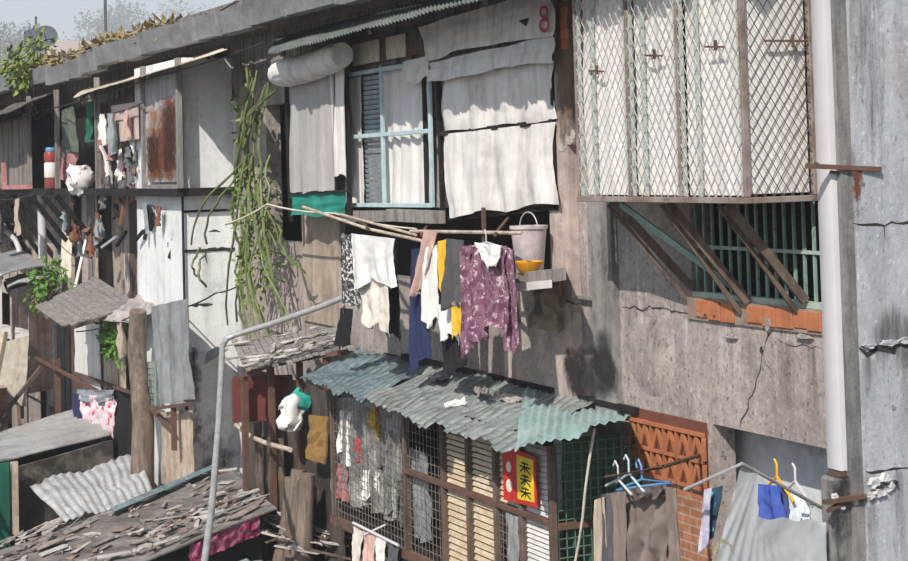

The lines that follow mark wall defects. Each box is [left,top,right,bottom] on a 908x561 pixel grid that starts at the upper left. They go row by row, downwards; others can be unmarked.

corrosion [145,73,177,183]
corrosion [852,170,862,201]
crack [853,221,908,237]
crack [625,305,688,314]
leakage [564,331,615,400]
crack [740,333,819,426]
spalling [867,472,899,500]